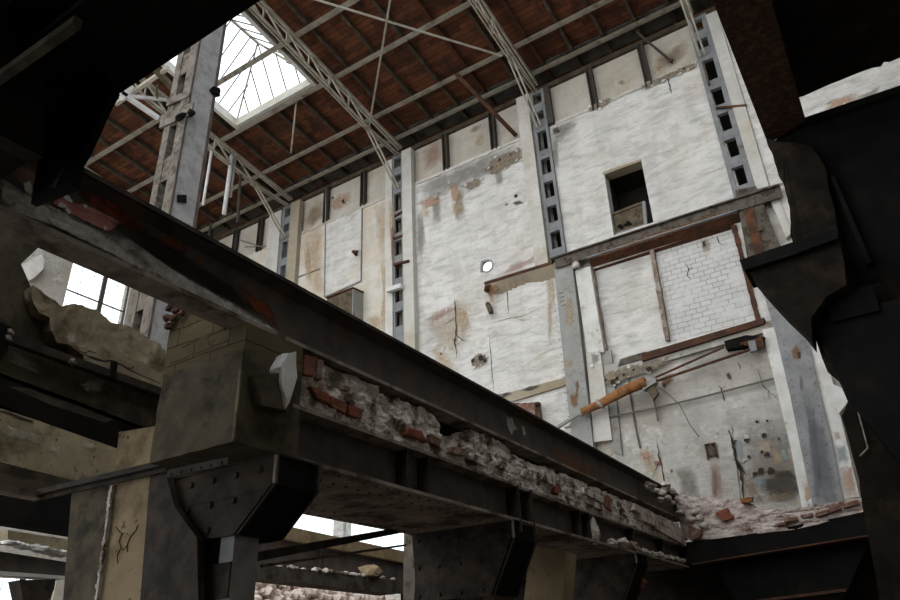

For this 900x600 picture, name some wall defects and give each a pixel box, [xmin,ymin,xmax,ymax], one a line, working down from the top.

spalling [447,146,523,204]
crack [445,299,465,354]
spalling [300,351,688,547]
crack [728,430,746,498]
peeling [737,420,791,498]
leakage [766,471,799,500]
spalling [94,485,115,600]
crack [115,525,138,564]